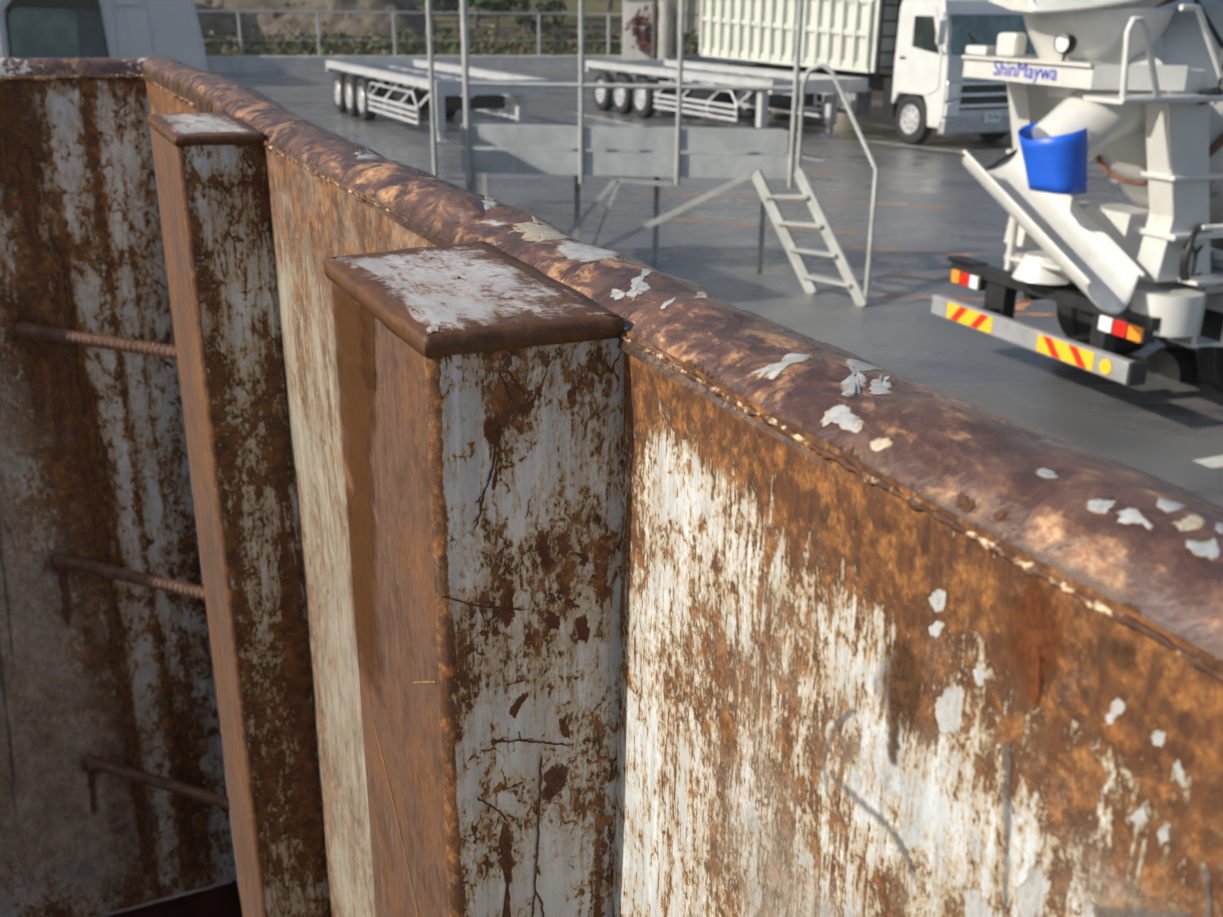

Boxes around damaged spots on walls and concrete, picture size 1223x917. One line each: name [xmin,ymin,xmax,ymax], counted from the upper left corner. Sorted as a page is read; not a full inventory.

peeling [512,215,621,264]
peeling [610,268,653,300]
peeling [750,353,815,379]
peeling [820,359,893,451]
rust [49,238,137,783]
peeling [1086,498,1153,530]
peeling [1156,498,1223,560]
rust [44,555,76,624]
peeling [928,588,947,638]
peeling [934,665,986,737]
rust [82,757,98,813]
crack [477,731,570,917]